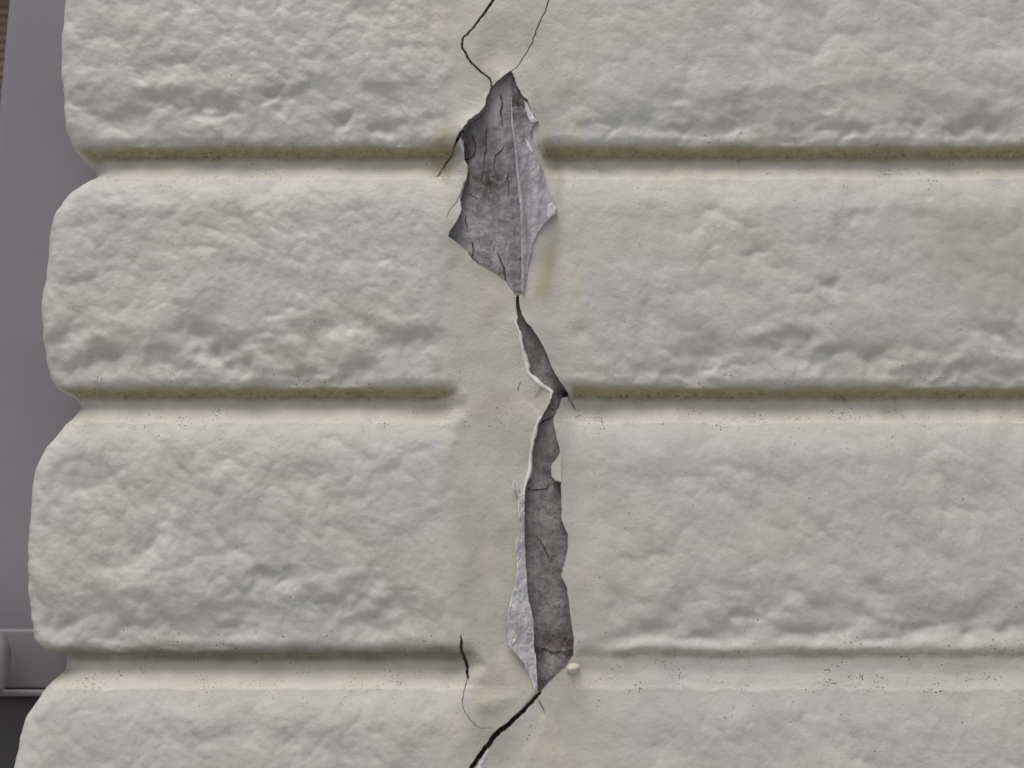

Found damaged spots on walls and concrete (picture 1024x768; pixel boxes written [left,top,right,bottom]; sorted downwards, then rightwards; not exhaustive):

crack [461,0,549,87]
crack [433,130,464,219]
peeling [448,70,574,692]
crack [460,636,545,768]